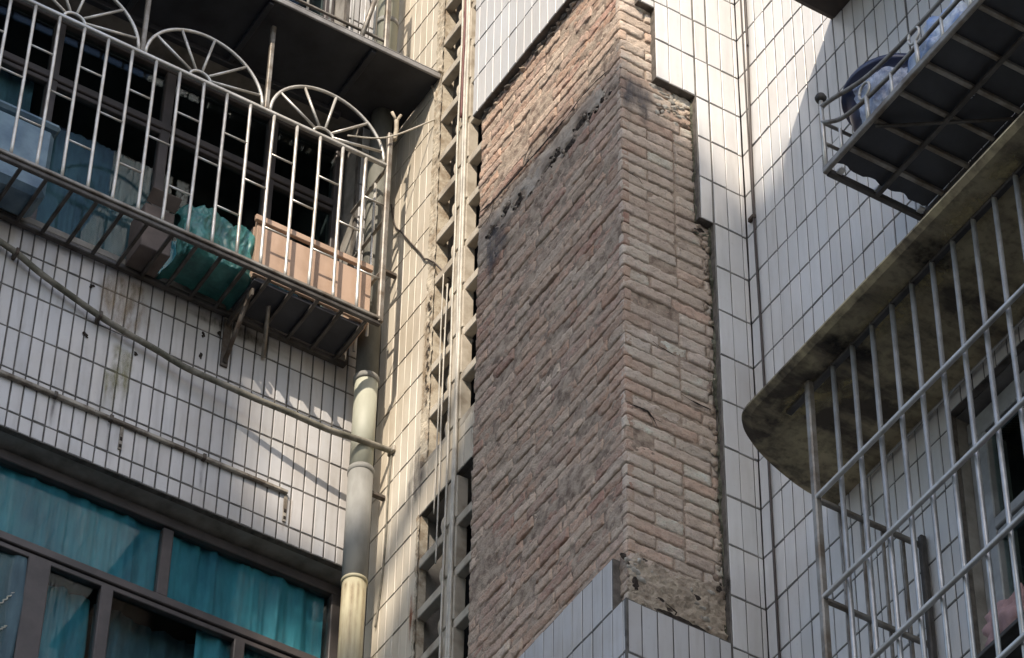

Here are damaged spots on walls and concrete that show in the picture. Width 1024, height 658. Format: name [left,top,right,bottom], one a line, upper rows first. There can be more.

spalling [620,532,728,640]